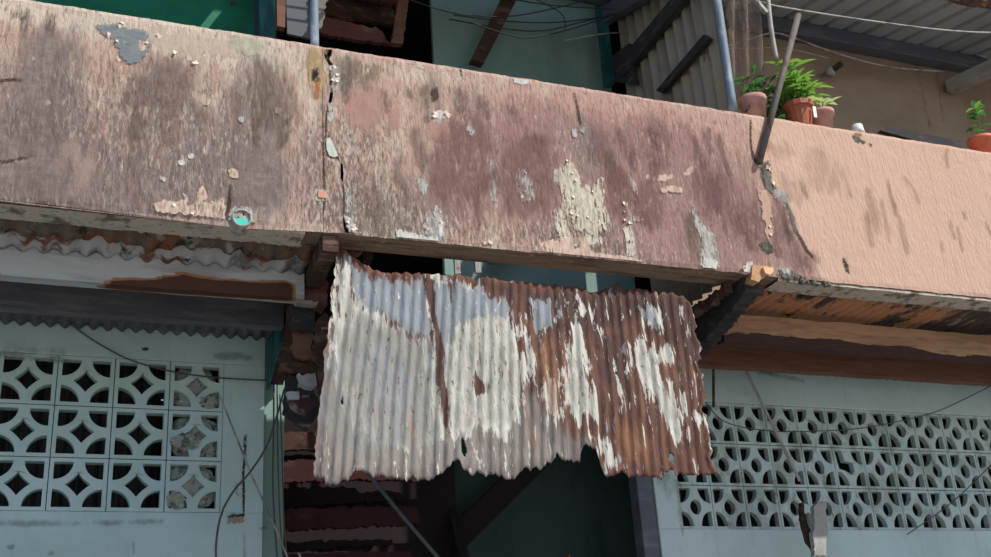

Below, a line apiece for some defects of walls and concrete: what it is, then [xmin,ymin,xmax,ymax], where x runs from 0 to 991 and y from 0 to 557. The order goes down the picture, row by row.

peeling [97,21,243,107]
crack [322,49,349,233]
peeling [153,186,226,219]
peeling [516,168,535,203]
peeling [534,159,697,261]
peeling [691,204,720,269]
crack [749,120,814,258]